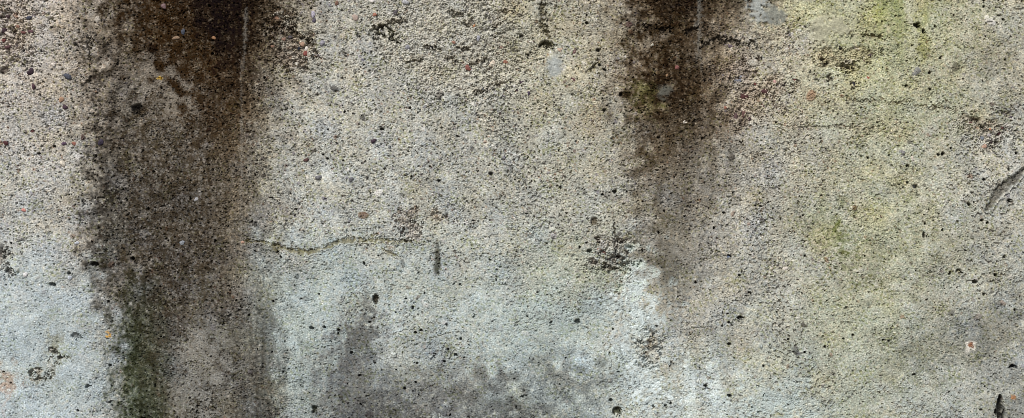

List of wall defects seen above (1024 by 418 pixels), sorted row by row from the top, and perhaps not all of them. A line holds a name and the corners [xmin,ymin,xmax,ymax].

crack [243,232,413,258]
leakage [0,0,786,418]